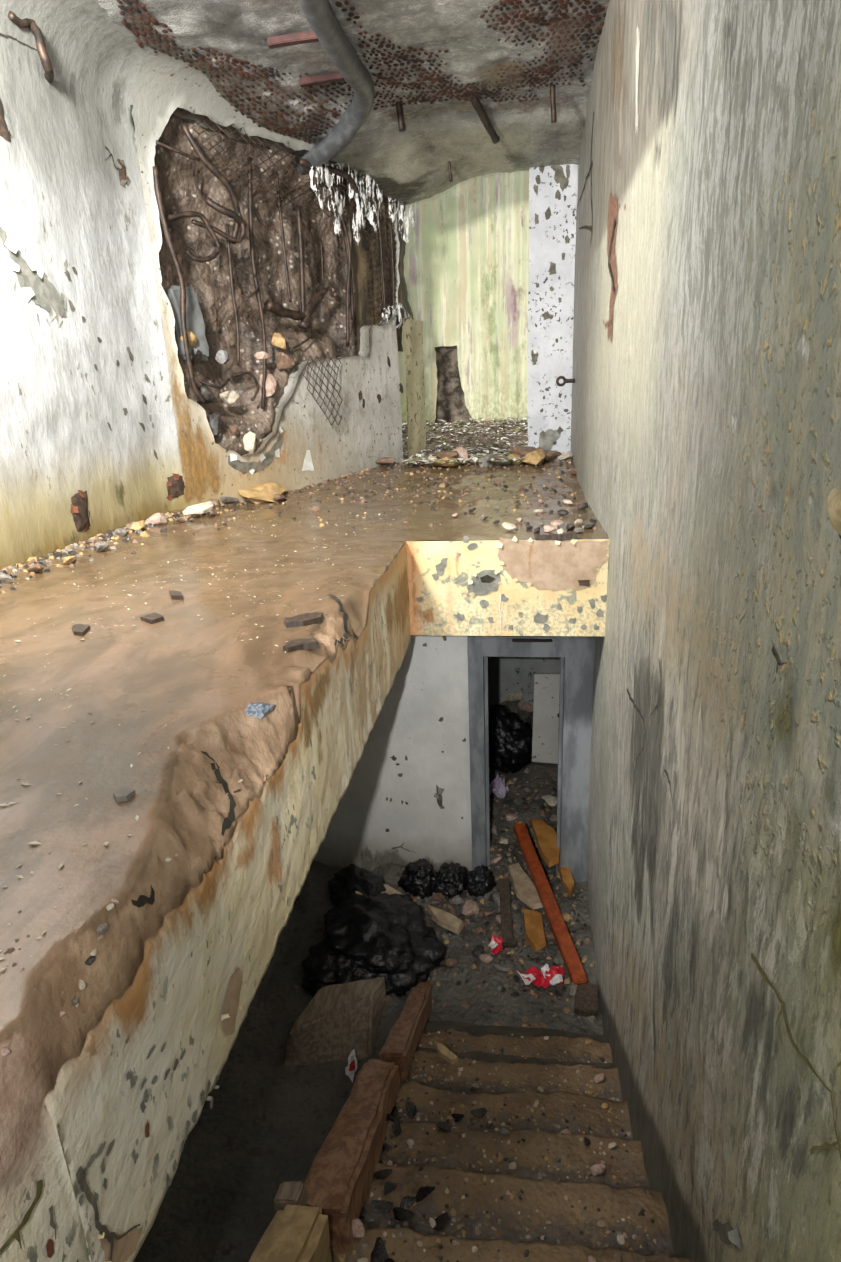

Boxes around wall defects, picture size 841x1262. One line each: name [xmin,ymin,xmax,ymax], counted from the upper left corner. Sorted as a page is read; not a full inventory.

spalling [0,99,11,142]
rust [132,20,345,139]
spalling [115,114,415,475]
rust [603,194,625,342]
rust [174,382,219,502]
peeling [432,558,447,580]
flaking render [467,536,609,631]
crack [201,751,236,836]
crack [751,953,841,1159]